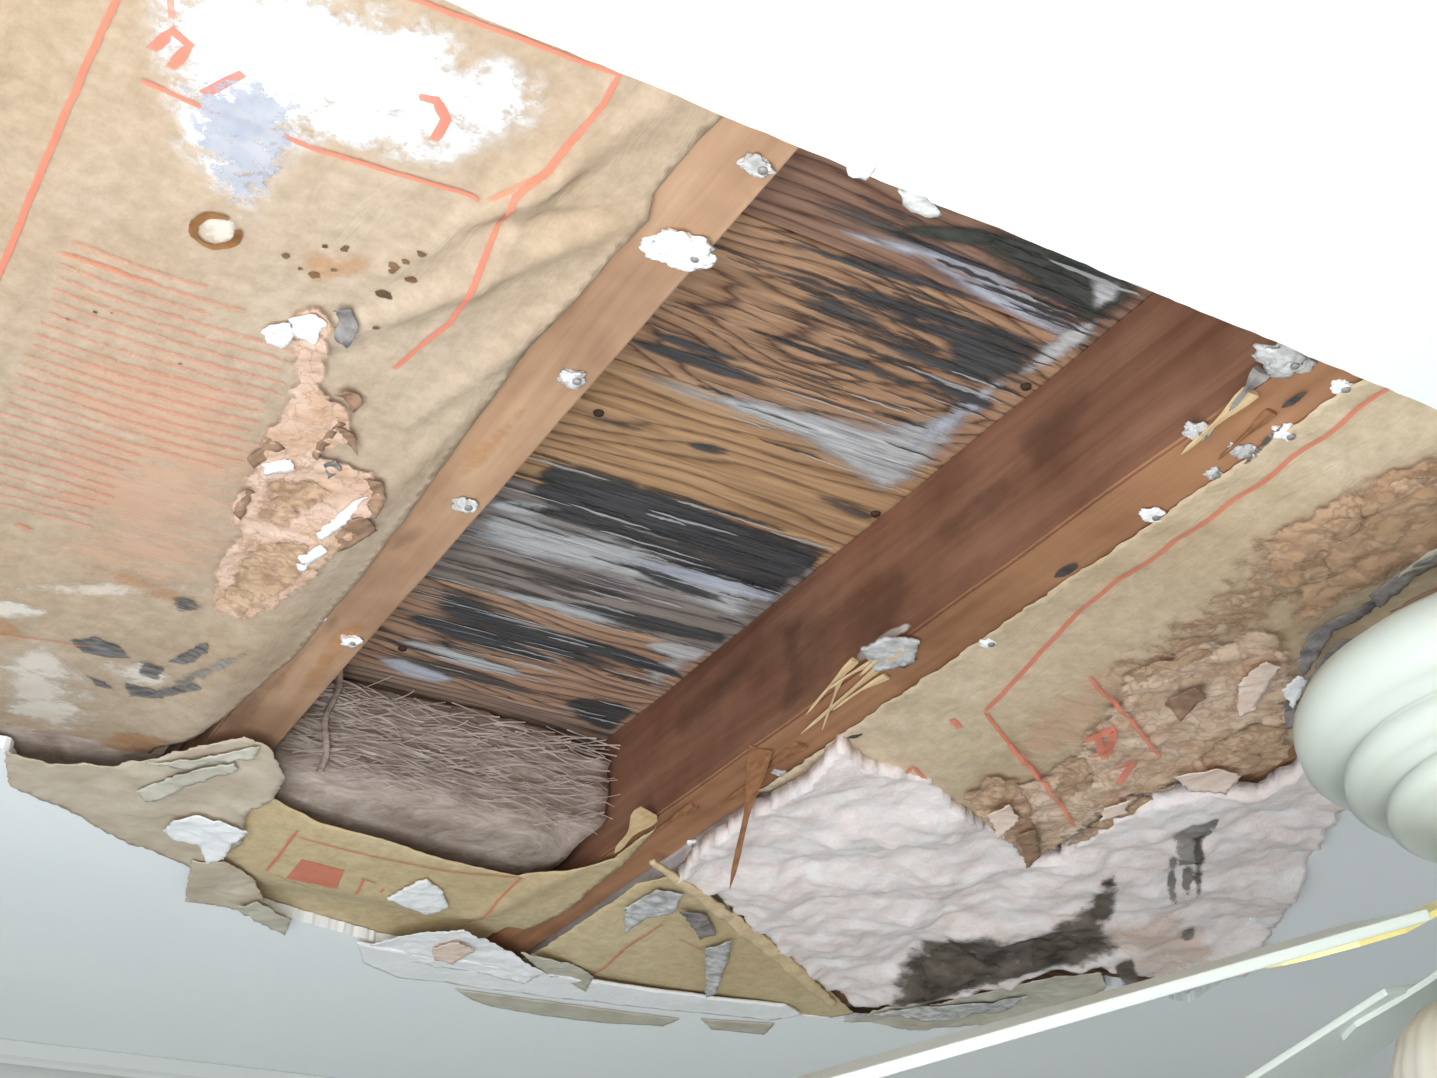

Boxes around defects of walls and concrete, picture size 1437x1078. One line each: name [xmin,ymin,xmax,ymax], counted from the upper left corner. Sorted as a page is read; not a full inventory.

water stain [281,253,337,279]
water stain [375,290,392,300]
water stain [388,251,426,283]
water stain [632,195,1143,493]
water stain [820,498,870,518]
water stain [373,452,833,730]
water stain [878,624,909,639]
peeling [1282,548,1437,708]
water stain [1167,819,1219,904]
water stain [892,879,1140,1007]
water stain [1181,928,1194,941]
peeling [357,940,801,1035]